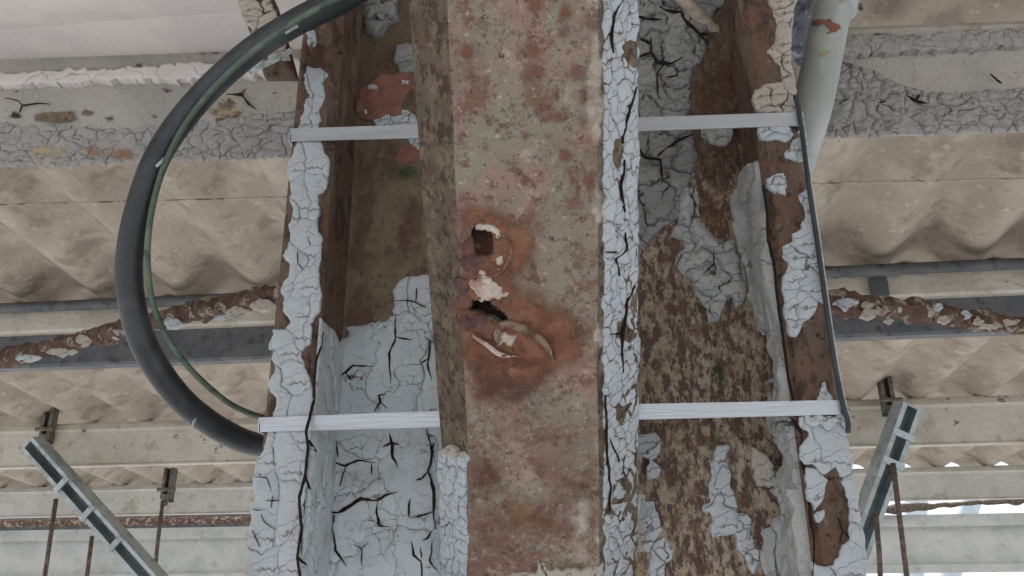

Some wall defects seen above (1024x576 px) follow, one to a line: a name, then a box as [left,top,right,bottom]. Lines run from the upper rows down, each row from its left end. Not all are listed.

crack [879,94,926,104]
corrosion [0,319,126,369]
corrosion [149,285,278,330]
peeling [171,43,439,417]
corrosion [453,206,582,399]
crack [604,0,709,373]
peeling [505,0,823,576]
corrosion [828,287,1024,335]
crack [252,288,436,576]
peeling [244,427,470,576]
crack [604,395,620,512]
peeling [702,414,868,576]